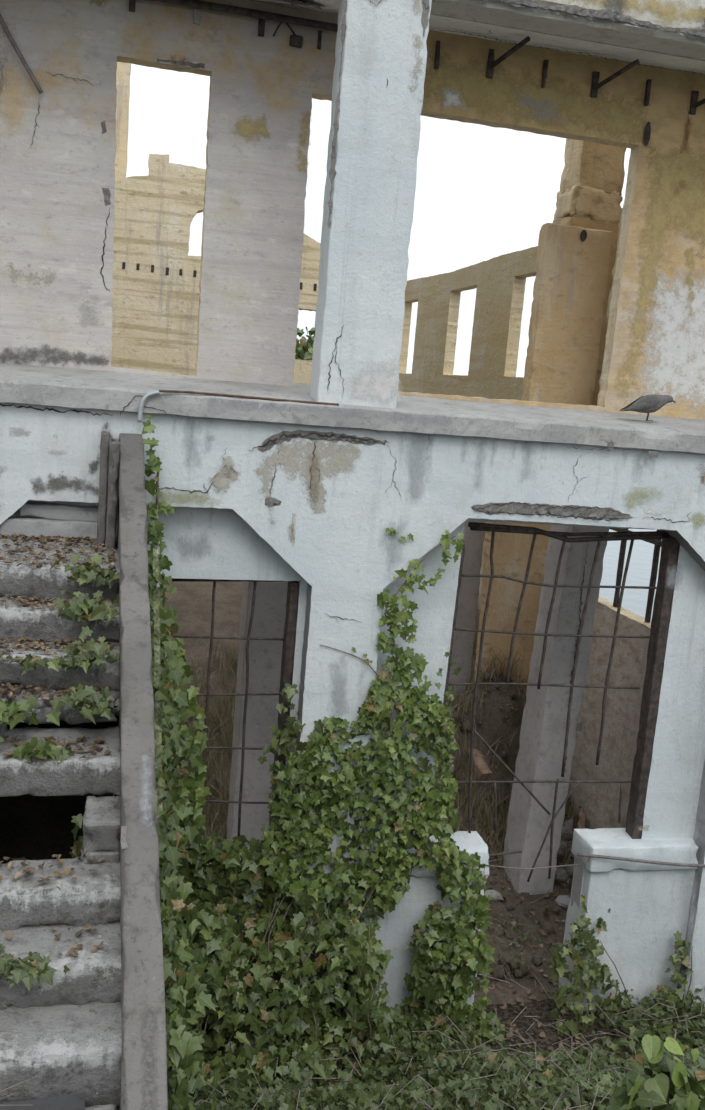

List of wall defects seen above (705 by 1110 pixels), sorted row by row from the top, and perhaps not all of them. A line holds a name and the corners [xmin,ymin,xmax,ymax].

crack [100,208,110,291]
crack [327,325,344,398]
leakage [641,248,705,411]
peeling [249,430,390,513]
spalling [471,502,662,521]